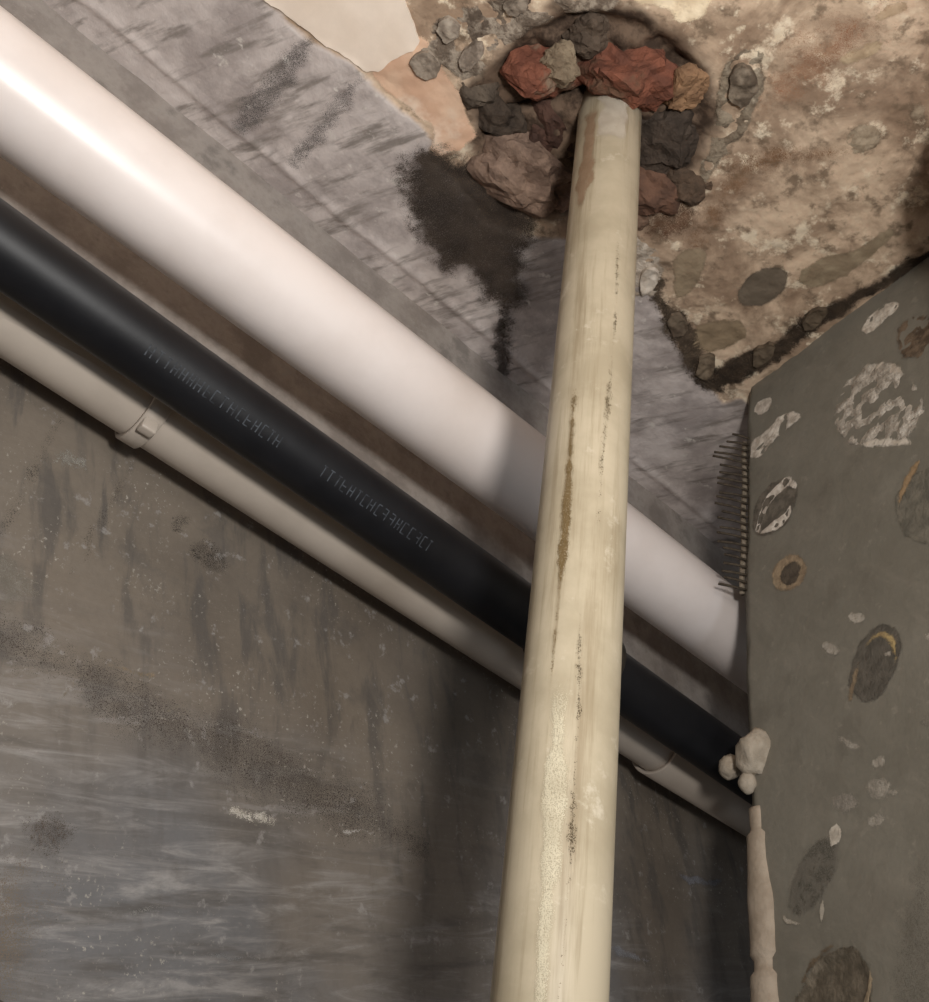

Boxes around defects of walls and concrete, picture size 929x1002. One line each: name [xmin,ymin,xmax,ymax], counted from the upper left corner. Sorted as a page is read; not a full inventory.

leakage [390,143,545,376]
spalling [264,0,929,398]
spalling [834,314,929,448]